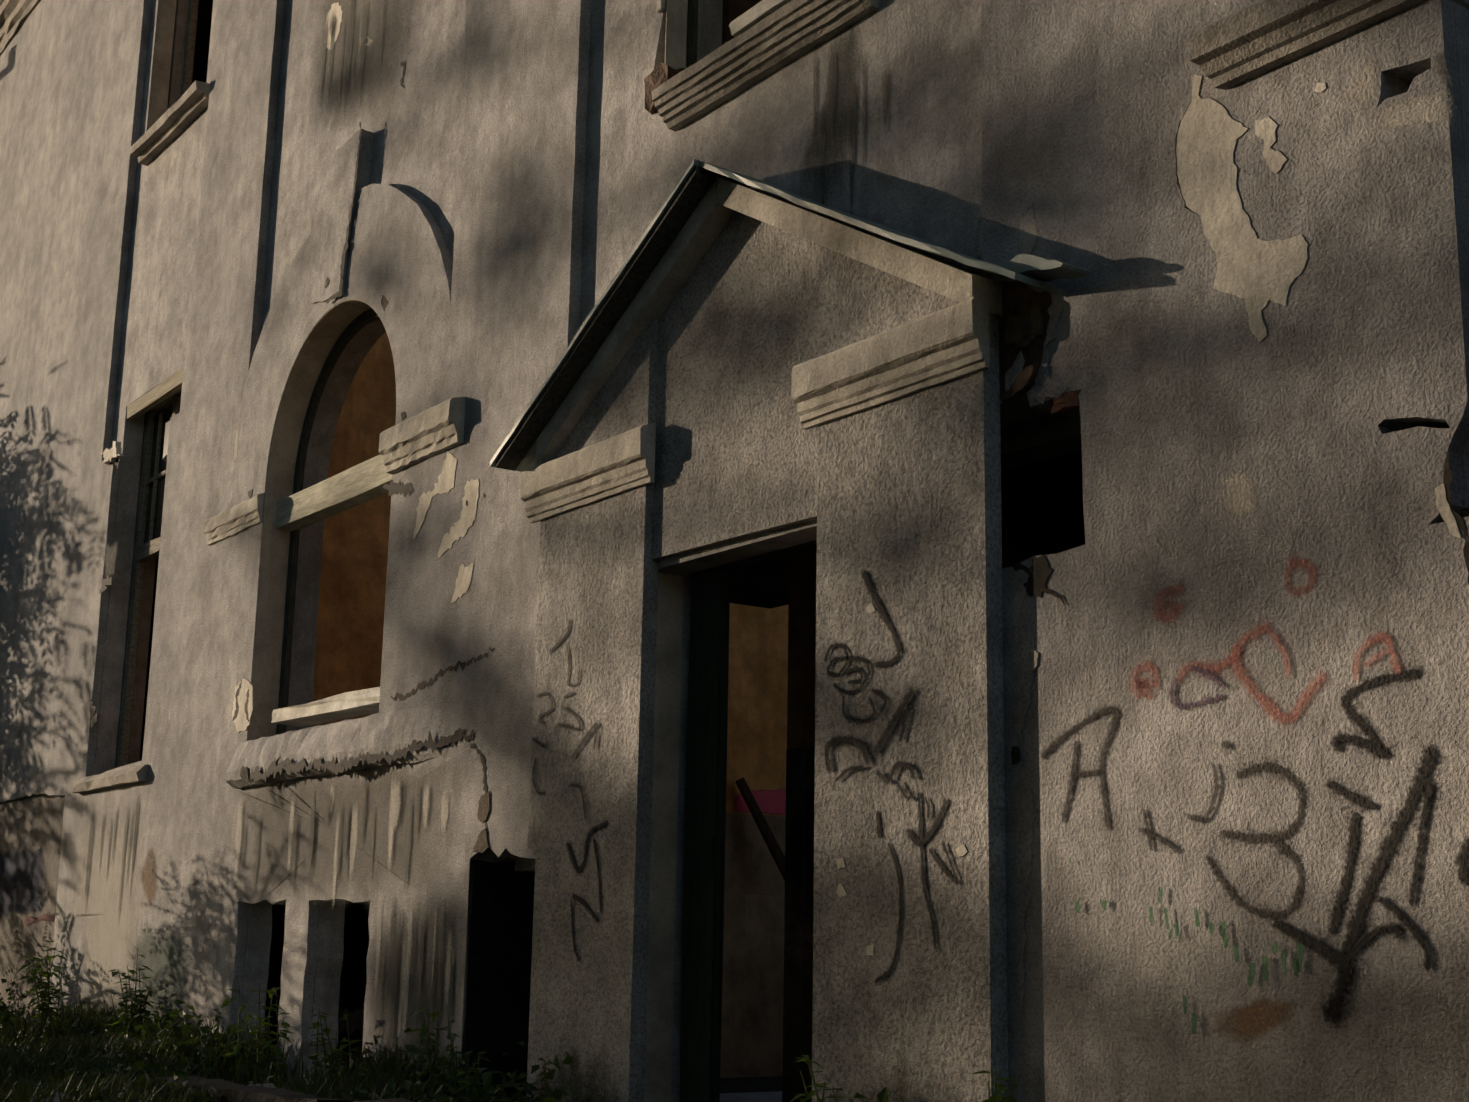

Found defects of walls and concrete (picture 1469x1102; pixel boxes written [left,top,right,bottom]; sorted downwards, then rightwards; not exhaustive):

peeling [1175,74,1308,343]
spalling [999,280,1080,416]
peeling [413,451,485,558]
crack [1435,452,1469,584]
peeling [451,563,474,604]
crack [391,647,495,701]
damp [235,770,448,896]
crack [240,728,490,853]
damp [375,906,456,1077]